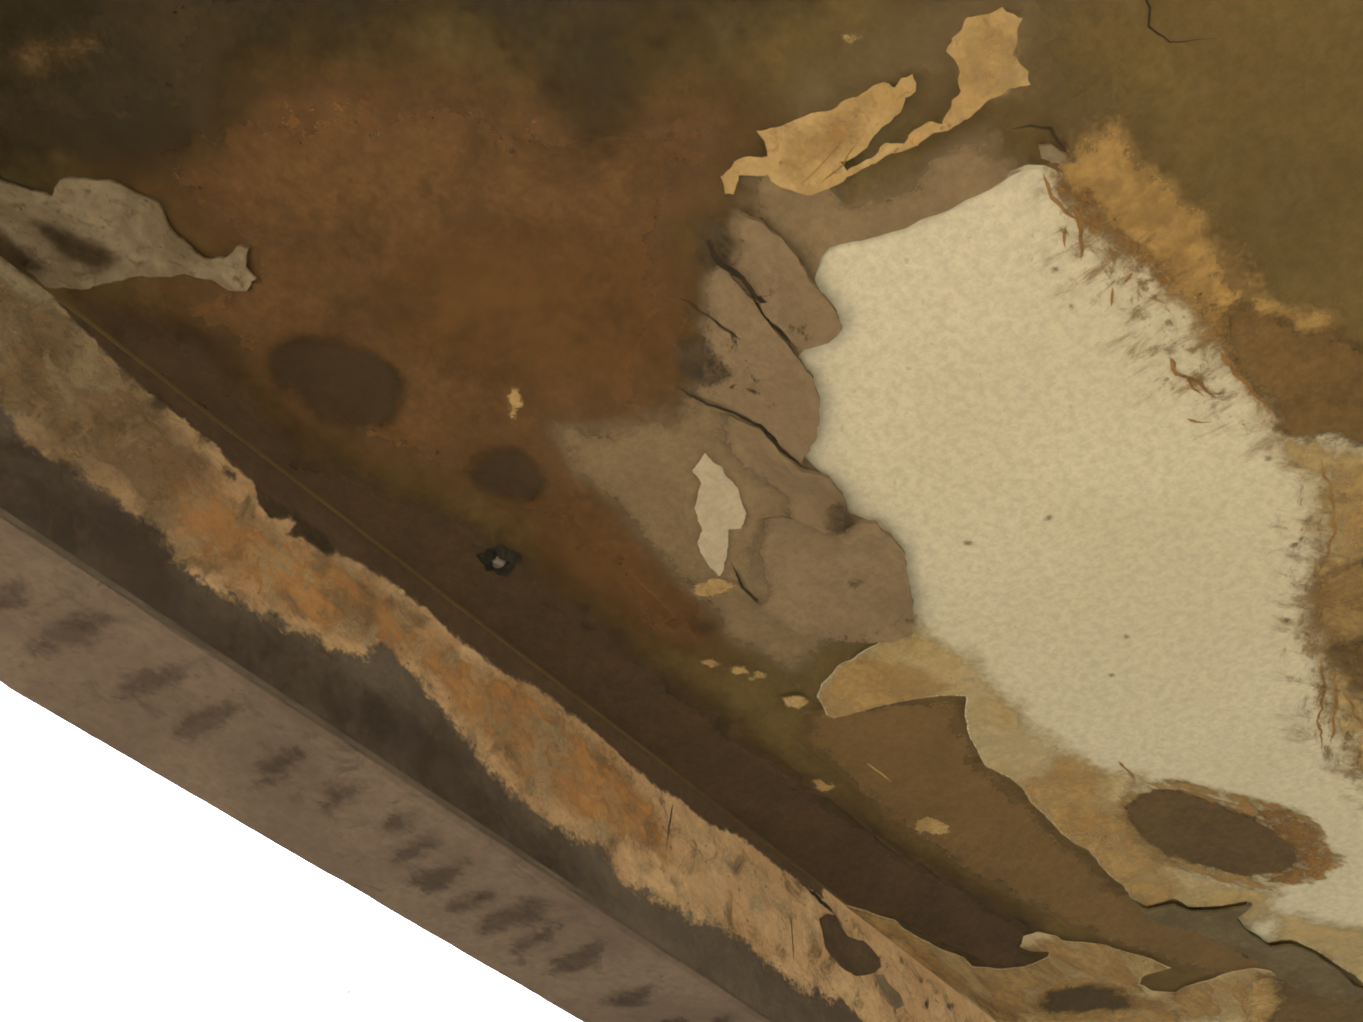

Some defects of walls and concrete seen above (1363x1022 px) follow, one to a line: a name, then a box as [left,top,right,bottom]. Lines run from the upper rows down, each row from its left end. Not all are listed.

leakage [0,0,759,170]
crack [1145,0,1216,43]
peeling [0,176,256,310]
crack [682,299,740,340]
crack [706,240,789,340]
corrosion [1043,116,1363,447]
spalling [507,388,523,419]
crack [675,385,778,442]
spalling [551,0,1363,1022]
leakage [0,276,1041,1022]
leakage [1116,762,1344,890]
leakage [1036,976,1142,1021]